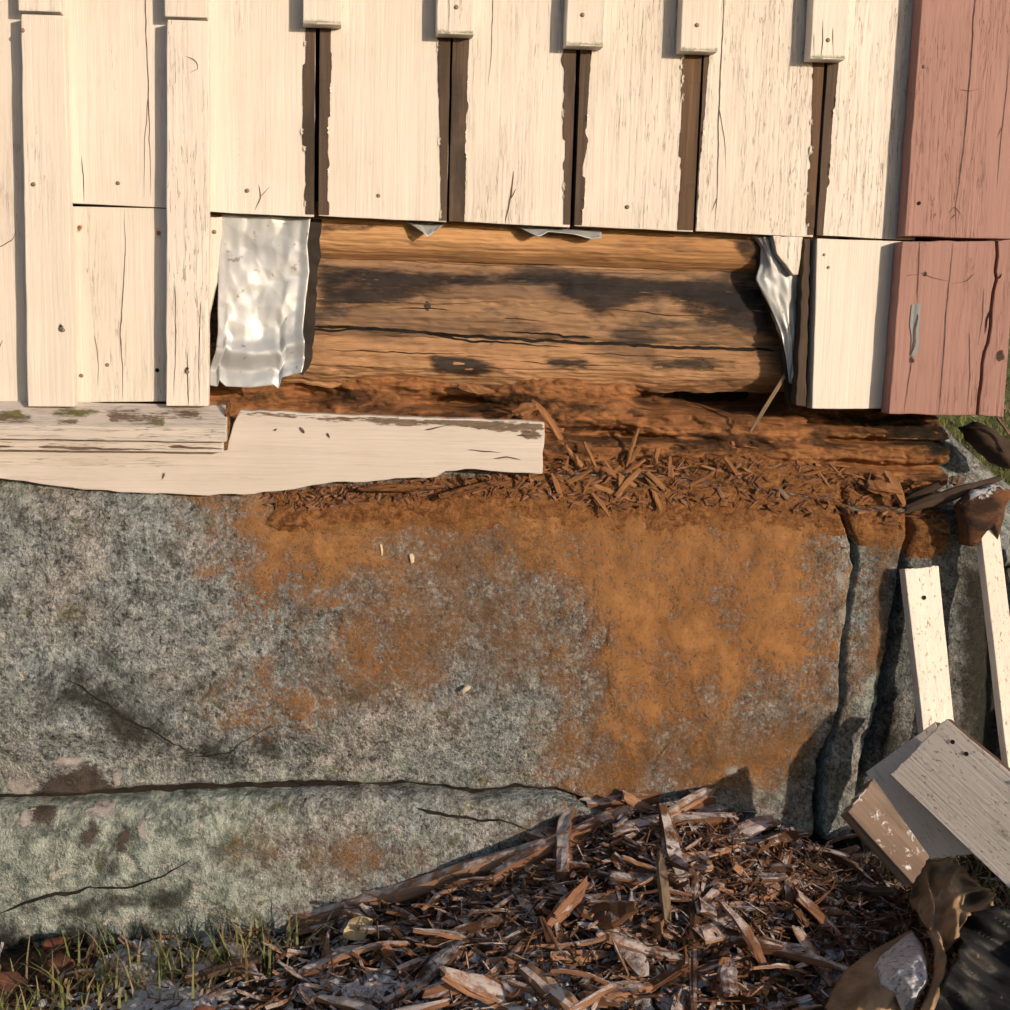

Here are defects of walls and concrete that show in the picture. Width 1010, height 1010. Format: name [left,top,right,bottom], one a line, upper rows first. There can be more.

crack [907,0,1002,406]
damp [320,265,773,332]
damp [431,356,494,376]
damp [546,359,586,369]
damp [654,358,717,370]
peeling [251,412,544,439]
corrosion [177,492,904,804]
crack [62,679,268,757]
crack [0,780,583,831]
crack [1,859,192,913]